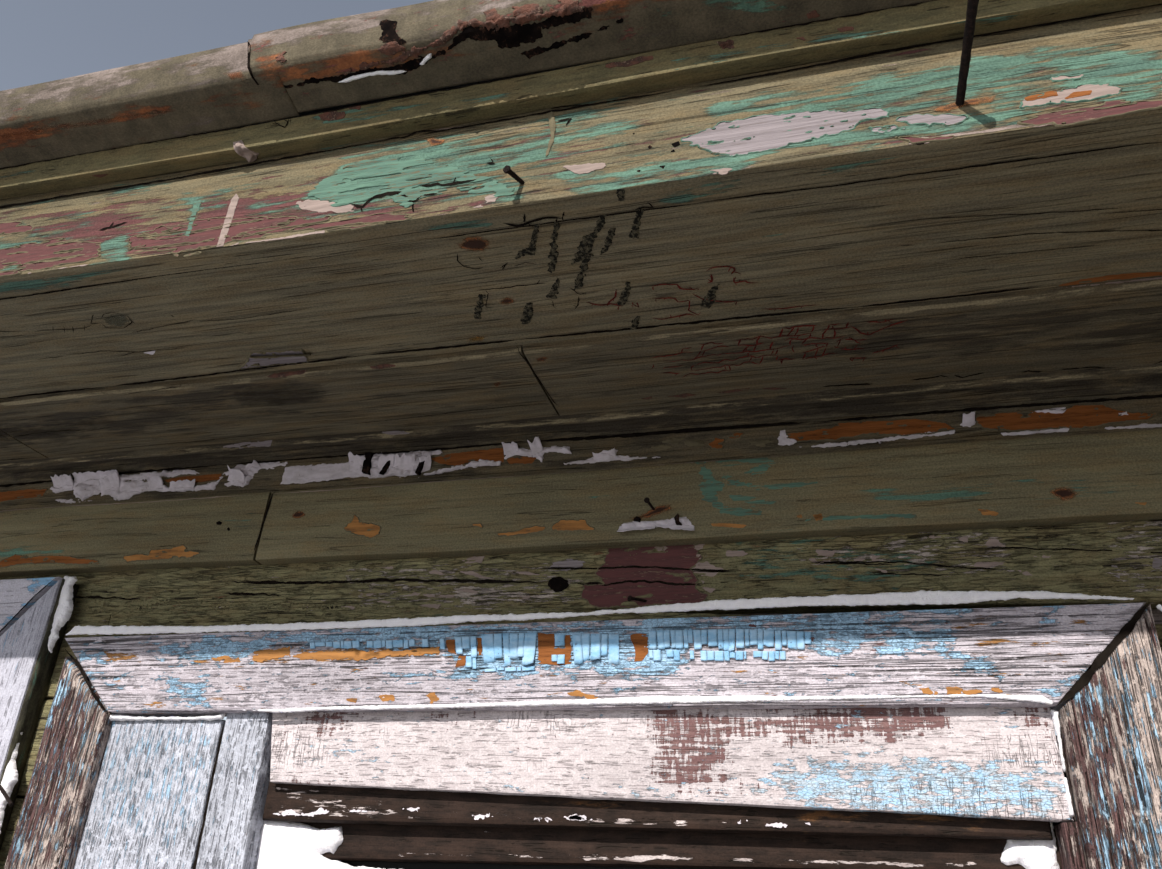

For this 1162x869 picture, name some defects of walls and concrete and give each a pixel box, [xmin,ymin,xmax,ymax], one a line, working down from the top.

crack [716,0,933,40]
crack [0,8,1135,208]
peeling [681,105,969,175]
peeling [1017,73,1162,127]
peeling [128,158,519,257]
crack [0,142,1162,399]
peeling [0,437,660,504]
crack [0,394,1162,512]
peeling [506,544,748,609]
crack [812,521,1112,576]
peeling [212,624,811,672]
peeling [273,808,329,817]